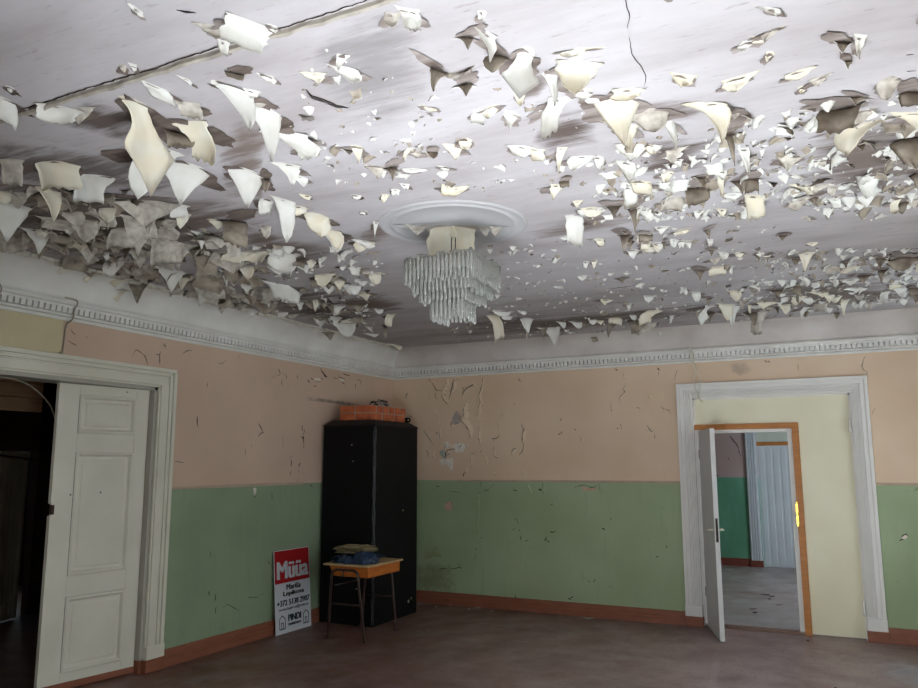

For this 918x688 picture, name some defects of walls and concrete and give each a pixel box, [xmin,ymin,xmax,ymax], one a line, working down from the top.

peeling [0,2,918,350]
crack [625,0,646,82]